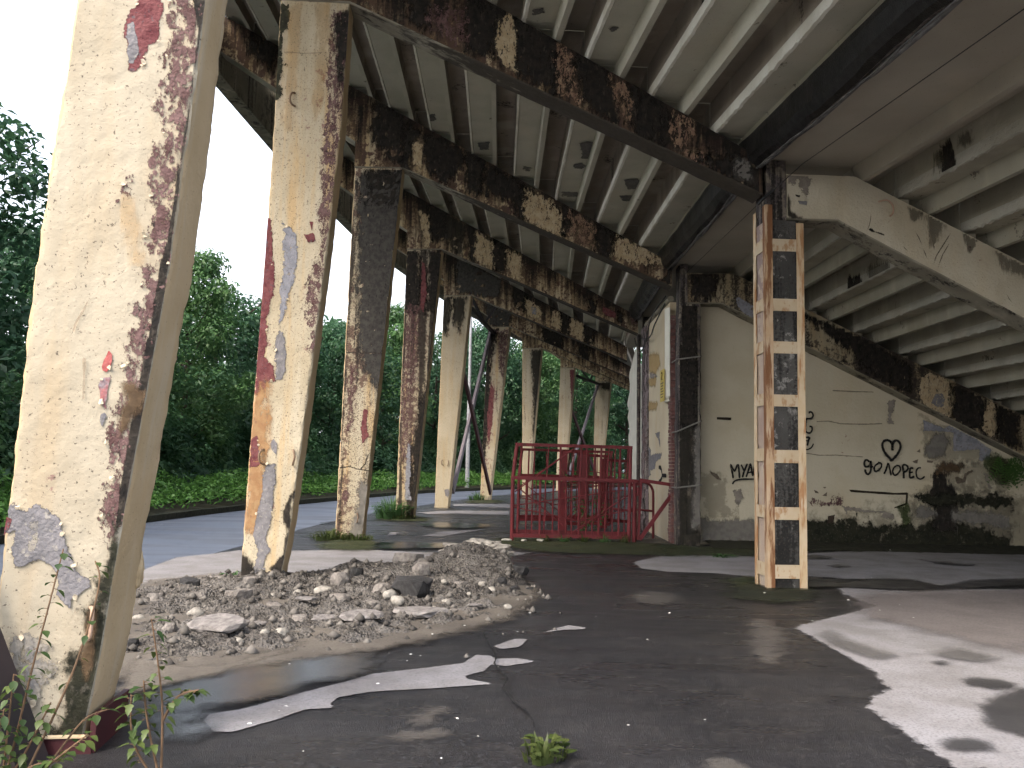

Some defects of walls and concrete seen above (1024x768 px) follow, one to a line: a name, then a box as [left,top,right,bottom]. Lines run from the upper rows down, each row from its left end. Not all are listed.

peeling [97,0,203,550]
peeling [255,7,349,396]
spalling [4,503,91,608]
spalling [249,436,277,573]
water stain [807,383,1023,546]
peeling [913,372,997,484]